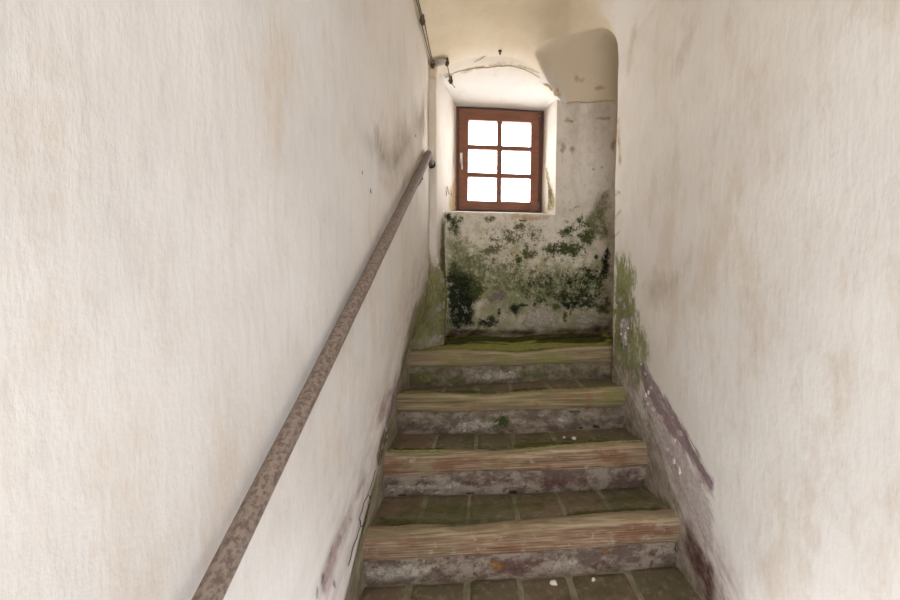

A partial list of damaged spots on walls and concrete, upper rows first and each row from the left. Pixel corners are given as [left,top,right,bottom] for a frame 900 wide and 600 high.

water stain [444,279,537,337]
flaking render [574,315,629,360]
peeling [633,362,714,600]